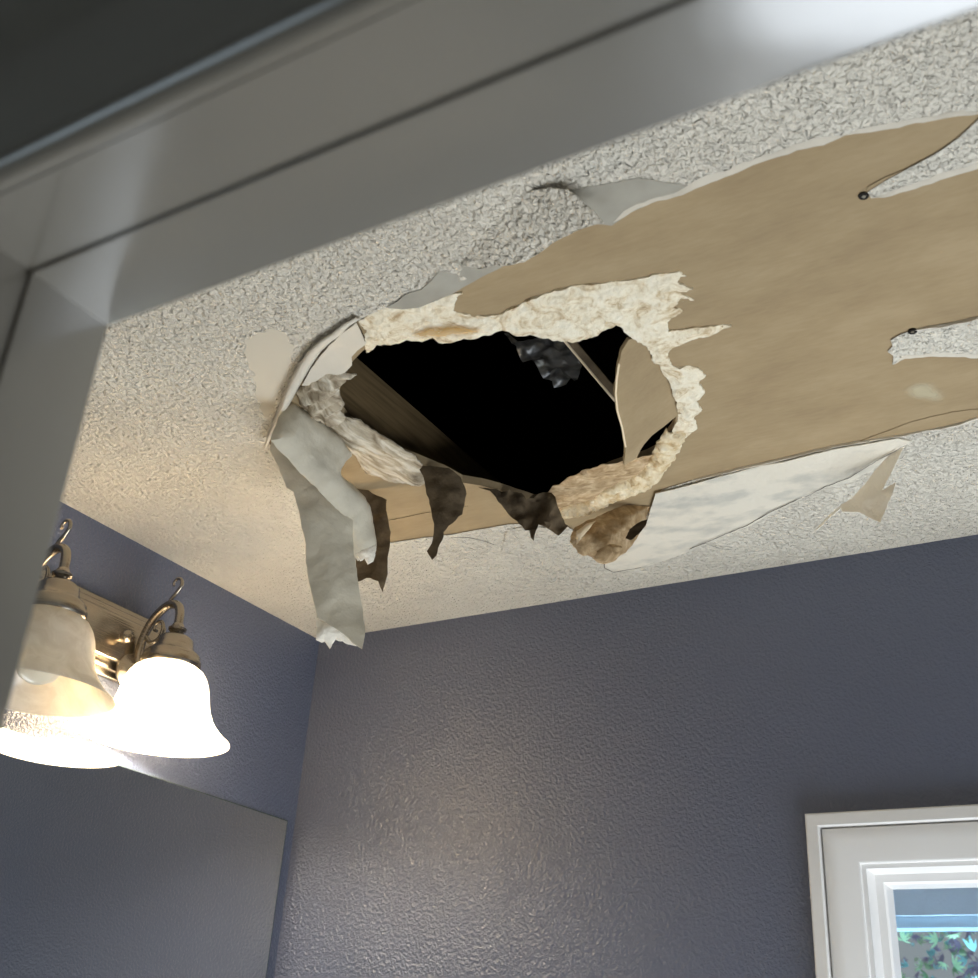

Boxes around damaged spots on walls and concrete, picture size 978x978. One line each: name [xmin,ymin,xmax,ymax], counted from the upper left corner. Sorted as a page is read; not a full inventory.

peeling [386,261,503,309]
peeling [605,438,912,572]
peeling [501,527,576,555]